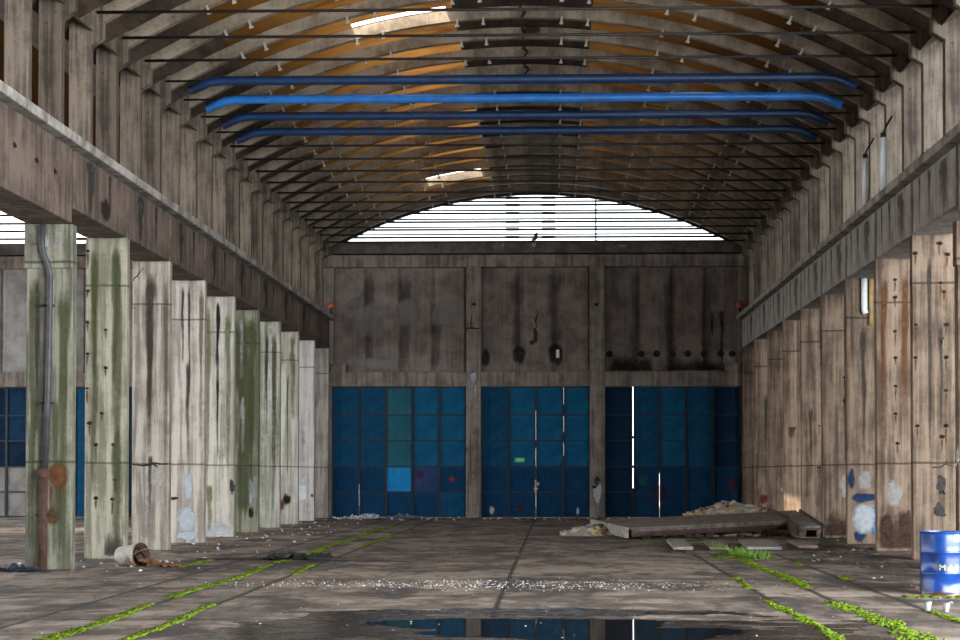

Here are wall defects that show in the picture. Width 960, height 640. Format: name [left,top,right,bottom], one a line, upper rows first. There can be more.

water stain [145,278,168,429]
water stain [181,290,203,433]
water stain [235,321,295,477]
rust [47,464,67,524]
water stain [104,524,122,555]
water stain [110,435,121,511]
water stain [879,482,911,549]